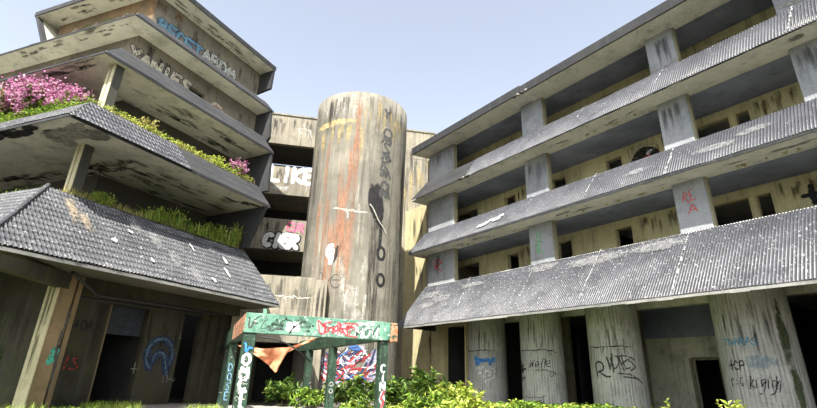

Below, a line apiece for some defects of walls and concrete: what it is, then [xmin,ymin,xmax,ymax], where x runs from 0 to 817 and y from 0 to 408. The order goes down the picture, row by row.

damp [0,125,68,141]
damp [84,130,110,141]
corrosion [316,101,362,277]
peeling [452,213,504,247]